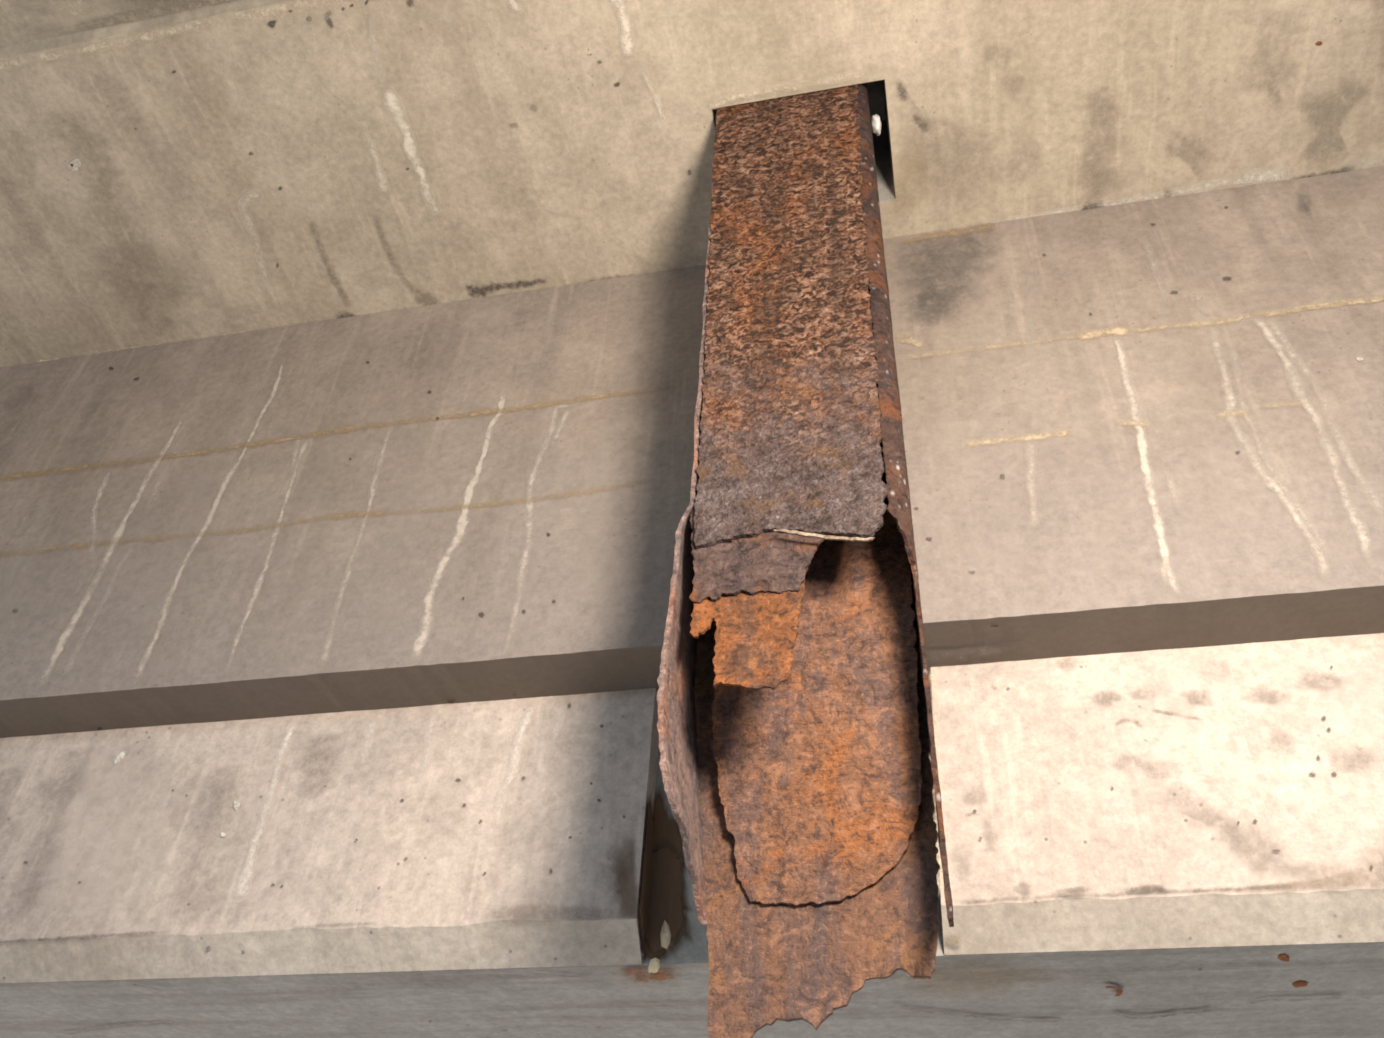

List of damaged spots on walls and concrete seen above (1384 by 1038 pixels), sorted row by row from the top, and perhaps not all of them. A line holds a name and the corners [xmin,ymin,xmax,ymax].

damp [41,418,183,681]
damp [137,365,283,676]
damp [232,439,308,655]
damp [321,429,392,660]
damp [413,394,506,656]
damp [507,405,569,642]
corrosion [690,567,808,690]
peeling [689,502,938,906]
damp [1114,340,1177,591]
damp [1212,333,1328,572]
damp [1255,319,1380,554]
corrosion [619,792,689,982]